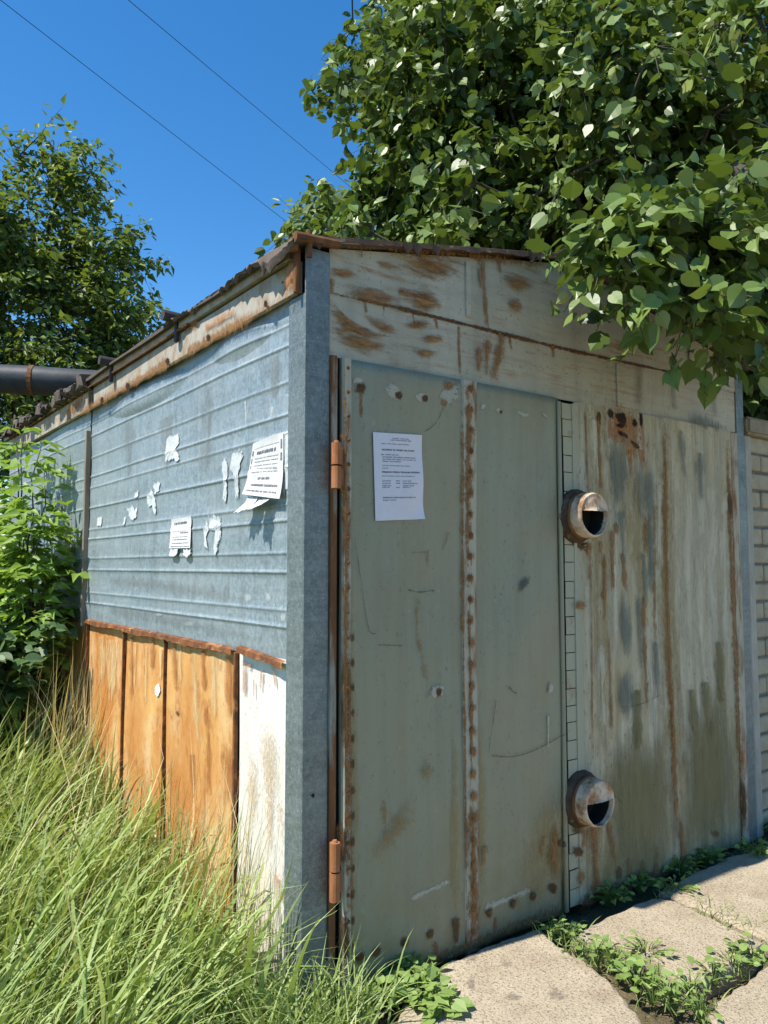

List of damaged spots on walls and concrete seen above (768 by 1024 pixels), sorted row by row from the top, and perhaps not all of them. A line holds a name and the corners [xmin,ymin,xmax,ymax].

corrosion [67,263,293,421]
corrosion [335,384,381,985]
corrosion [404,384,557,972]
corrosion [330,246,668,379]
corrosion [585,410,644,490]
corrosion [541,434,701,910]
corrosion [726,443,747,828]